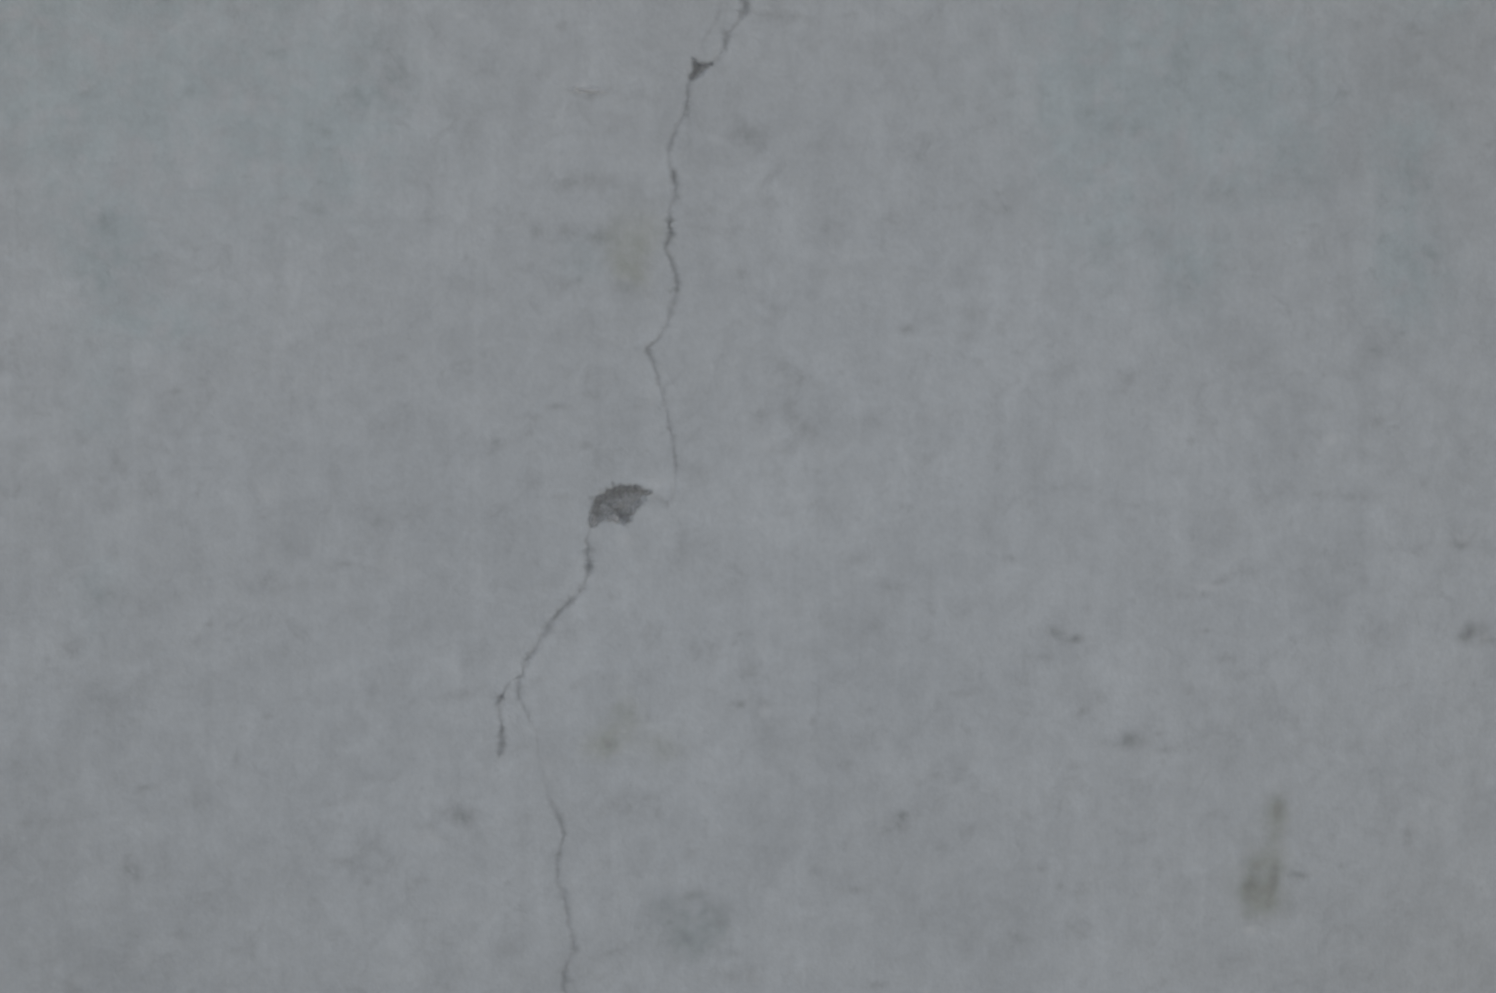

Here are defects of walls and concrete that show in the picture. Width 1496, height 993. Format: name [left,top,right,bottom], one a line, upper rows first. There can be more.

flaking render [589,485,652,527]